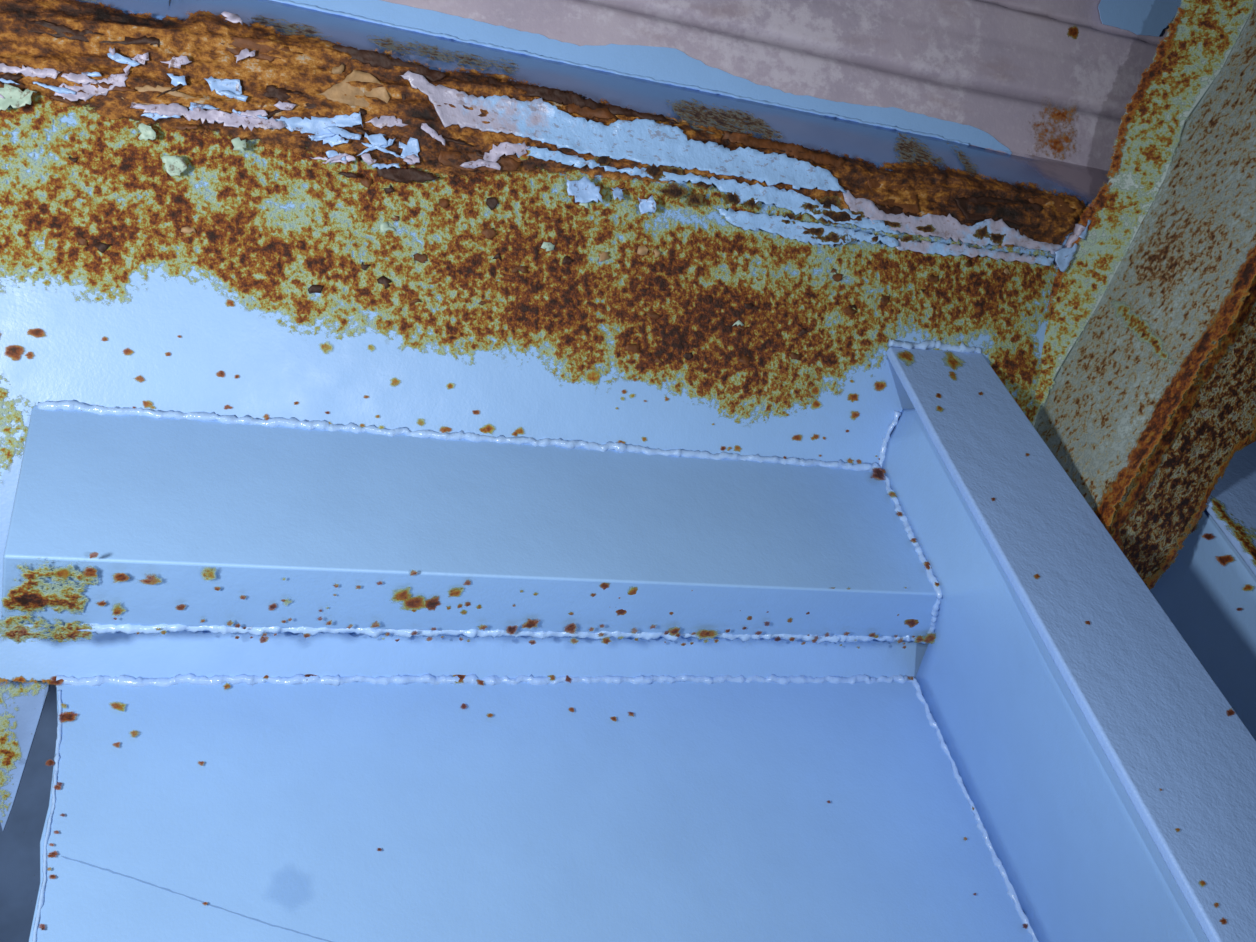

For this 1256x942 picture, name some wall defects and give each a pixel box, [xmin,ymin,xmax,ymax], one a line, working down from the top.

peeling [1098,0,1182,37]
peeling [0,47,192,111]
peeling [130,76,445,169]
peeling [161,155,187,177]
peeling [460,142,530,170]
peeling [566,176,656,215]
rust [0,0,1256,591]
rust [0,552,162,644]
rust [377,570,482,615]
rust [564,610,879,649]
rust [59,703,78,722]
rust [0,676,64,823]